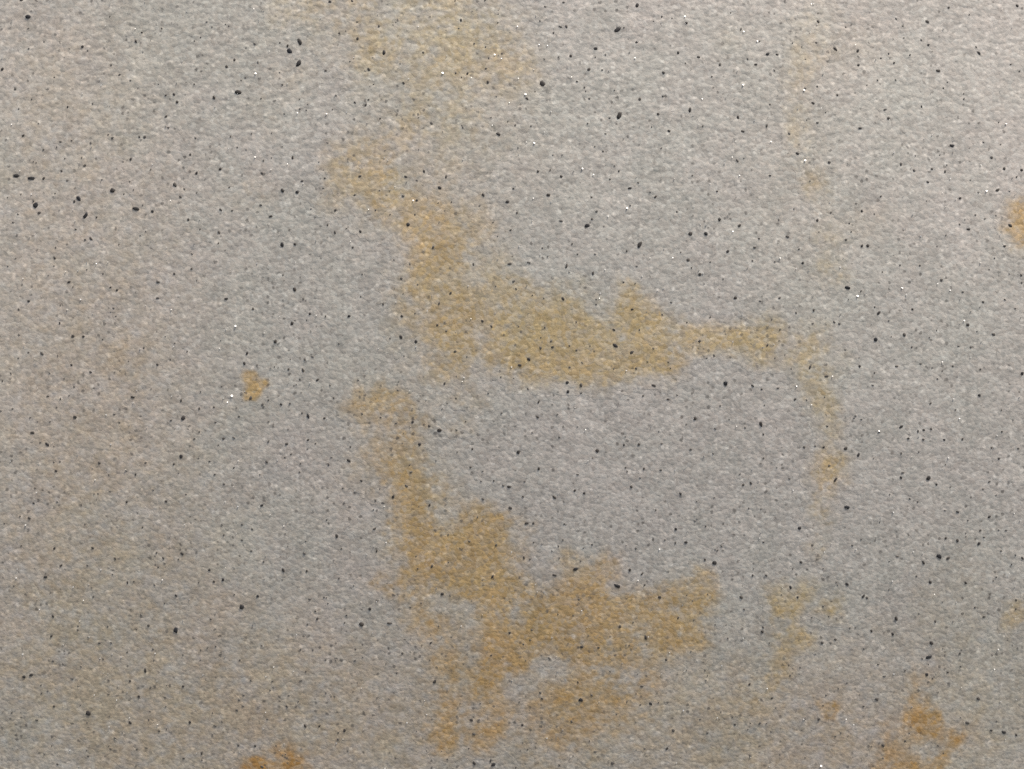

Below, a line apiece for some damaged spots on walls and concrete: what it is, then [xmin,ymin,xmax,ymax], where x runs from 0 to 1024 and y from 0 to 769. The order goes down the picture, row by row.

rust [239,368,273,405]
rust [308,122,859,769]